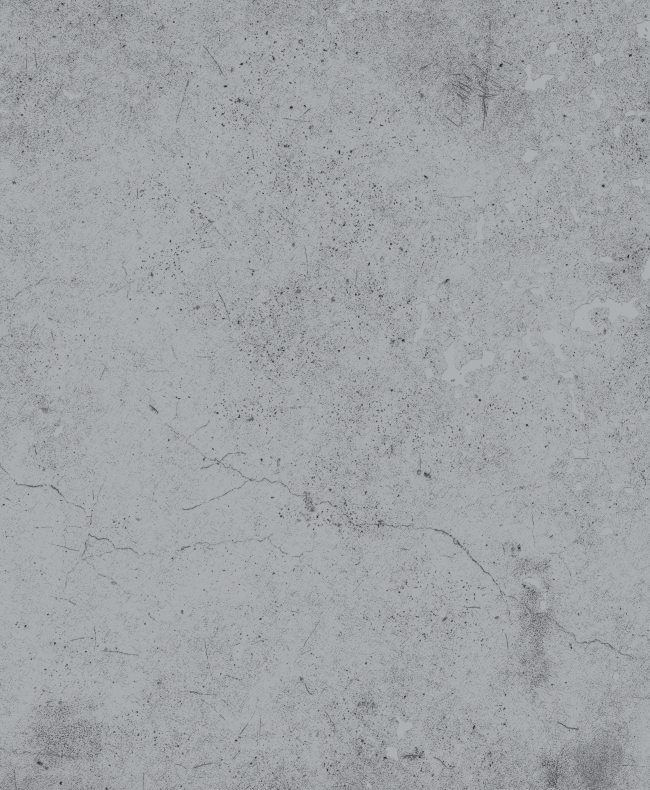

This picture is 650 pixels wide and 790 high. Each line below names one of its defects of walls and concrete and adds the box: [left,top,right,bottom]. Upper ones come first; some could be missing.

peeling [437,338,500,401]
crack [1,467,311,594]
crack [179,452,649,657]